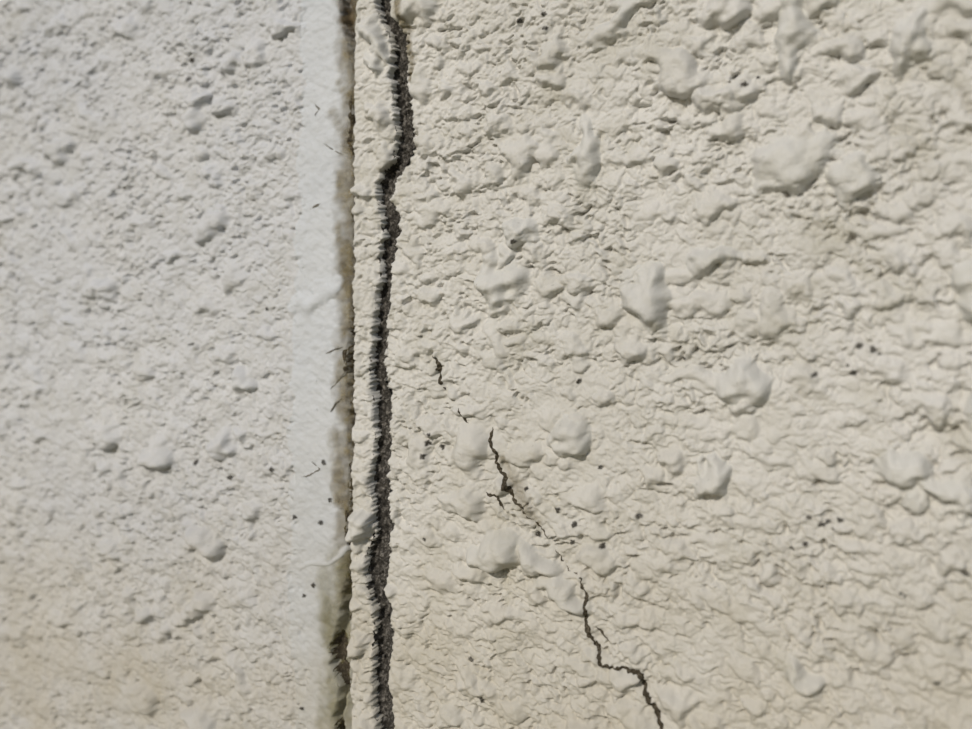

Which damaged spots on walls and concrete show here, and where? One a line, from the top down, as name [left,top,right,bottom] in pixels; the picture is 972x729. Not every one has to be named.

crack [325,0,415,729]
crack [432,355,468,423]
crack [486,427,664,729]